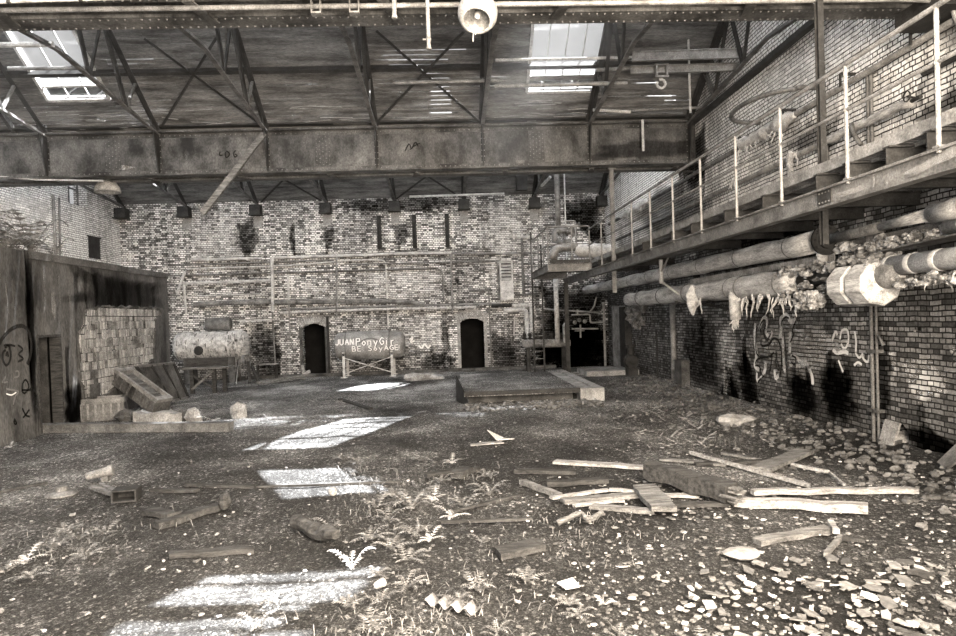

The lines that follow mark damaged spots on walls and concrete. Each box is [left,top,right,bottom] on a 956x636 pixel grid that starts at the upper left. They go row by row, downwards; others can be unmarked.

water stain [767,333,858,422]